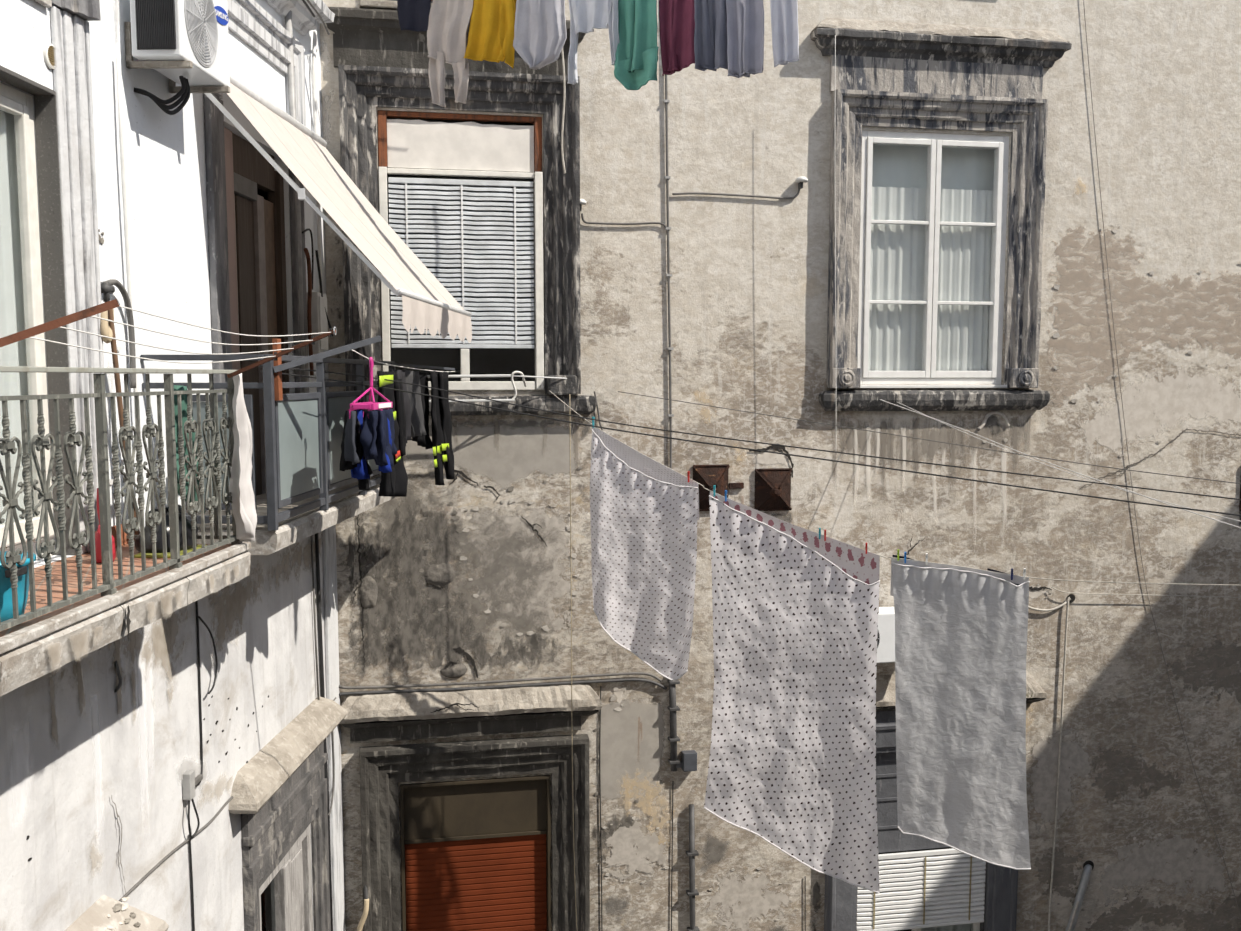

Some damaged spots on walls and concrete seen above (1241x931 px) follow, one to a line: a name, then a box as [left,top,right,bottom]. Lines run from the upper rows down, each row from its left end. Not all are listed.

flaking render [1047,226,1241,458]
peeling [405,426,434,468]
damp [833,417,1031,514]
crack [1079,429,1241,489]
flaking render [419,424,583,636]
crack [111,795,126,894]